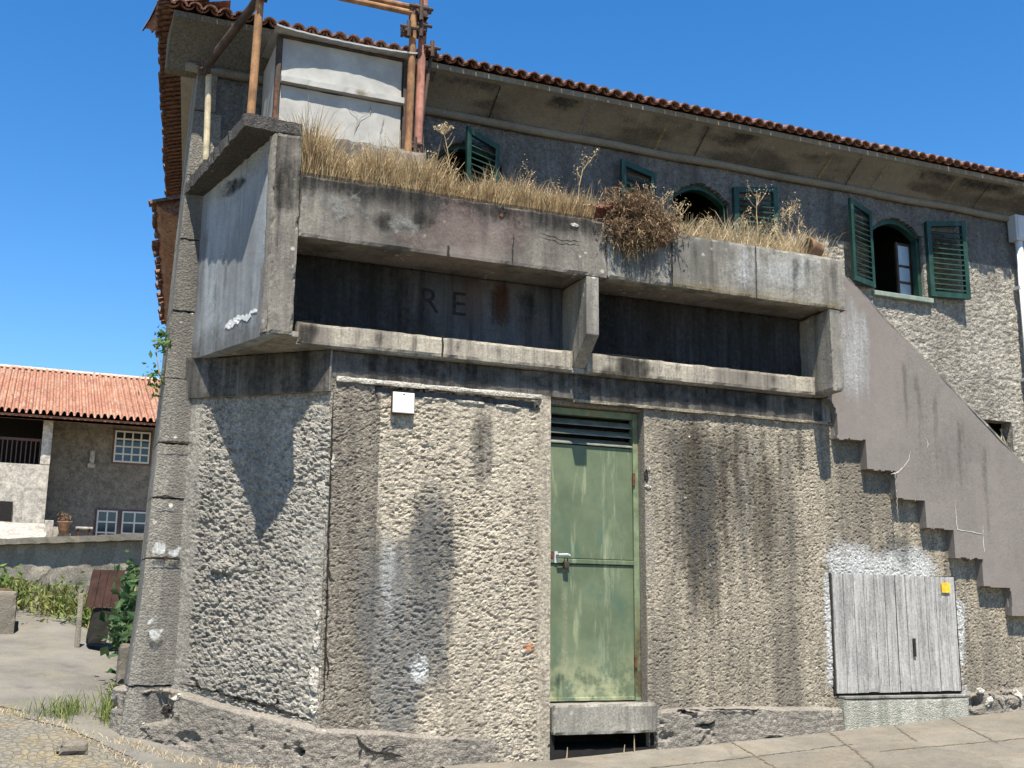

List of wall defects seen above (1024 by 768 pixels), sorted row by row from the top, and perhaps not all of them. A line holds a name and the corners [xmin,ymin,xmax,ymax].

peeling [225,308,258,329]
damp [677,418,725,601]
crack [892,439,928,517]
damp [359,489,454,732]
spalling [143,689,182,720]
crack [356,736,406,758]